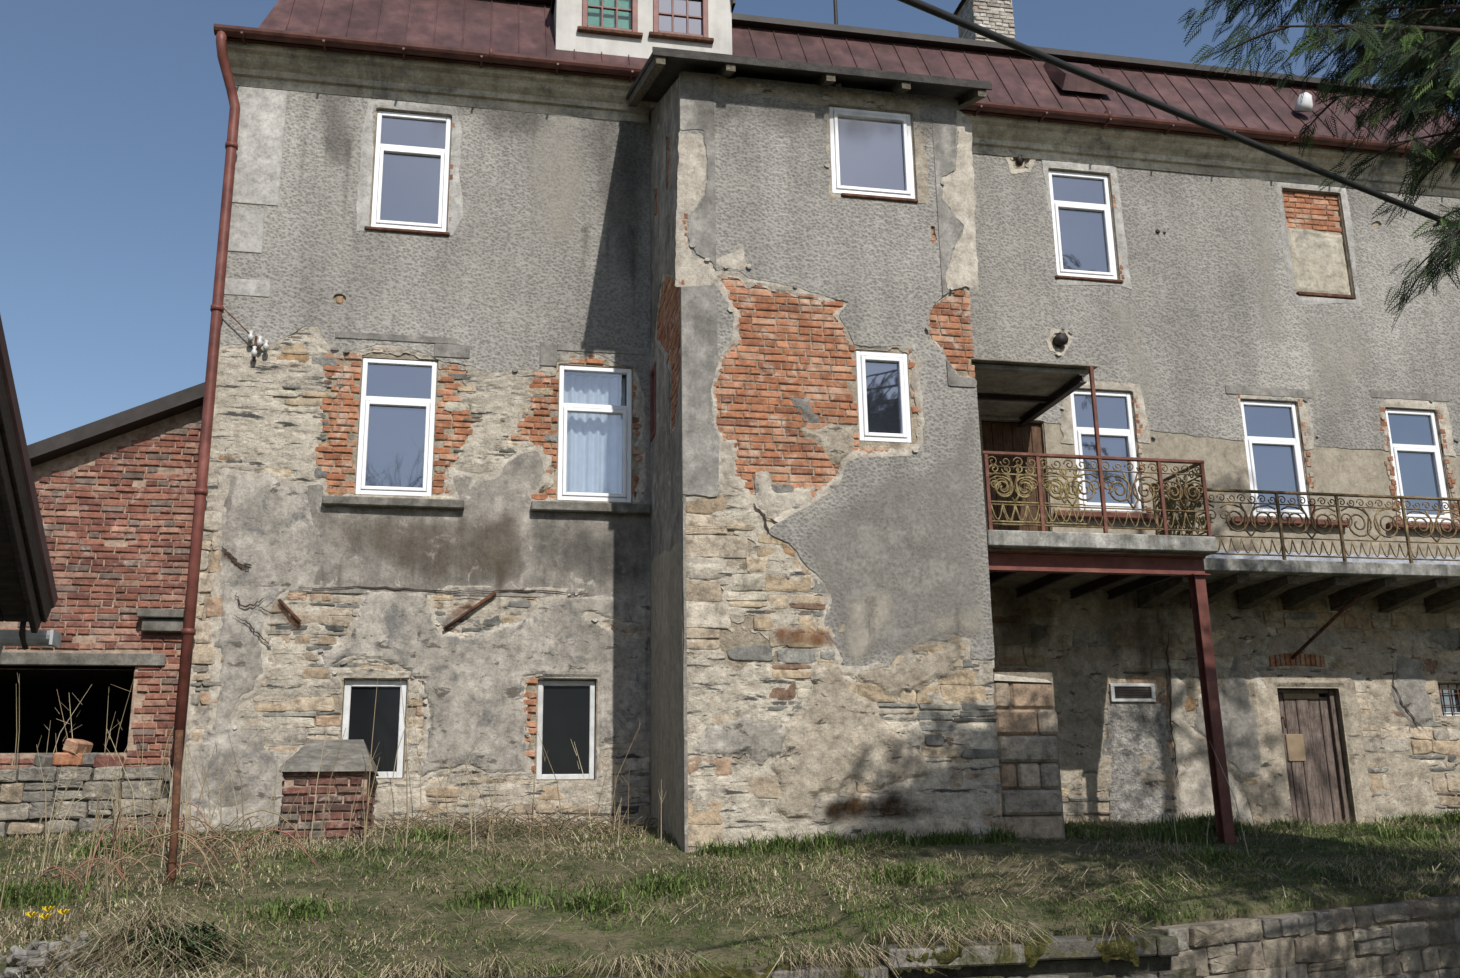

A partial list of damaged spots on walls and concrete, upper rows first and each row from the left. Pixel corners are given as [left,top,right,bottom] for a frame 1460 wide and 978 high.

spalling [186,326,651,829]
spalling [655,75,1005,852]
flaking render [1282,192,1342,232]